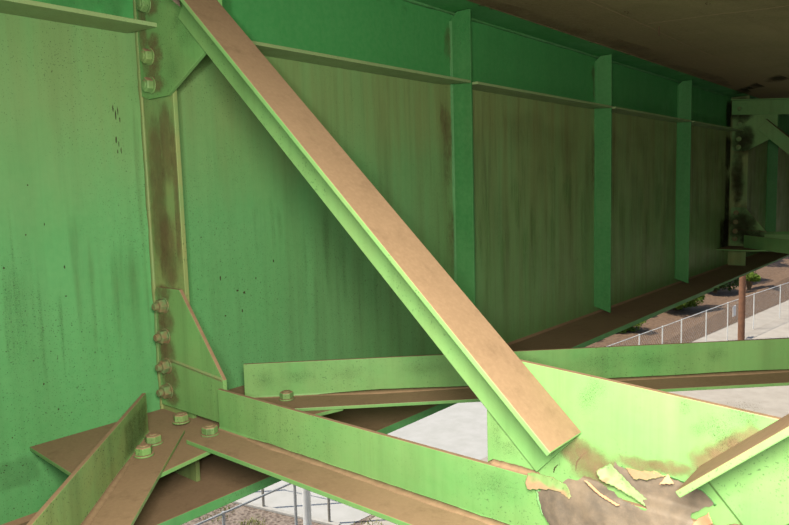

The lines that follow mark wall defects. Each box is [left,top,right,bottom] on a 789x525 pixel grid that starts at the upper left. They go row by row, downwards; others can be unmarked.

leakage [720,180,730,247]
rust [696,430,758,466]
peeling [525,462,717,525]